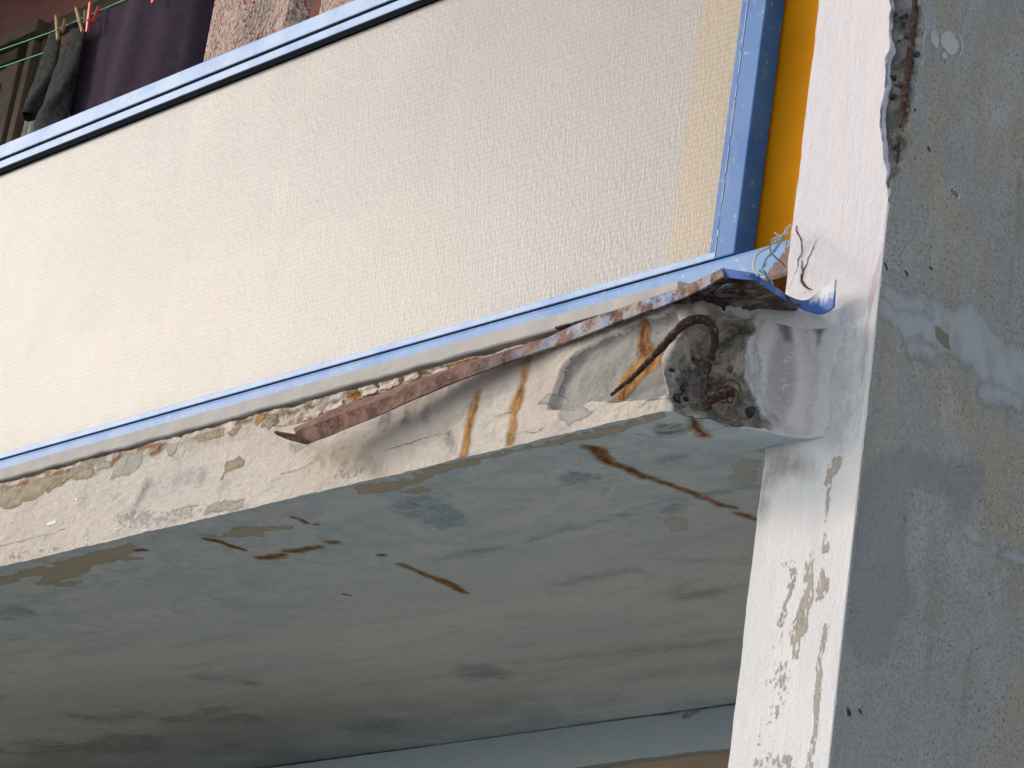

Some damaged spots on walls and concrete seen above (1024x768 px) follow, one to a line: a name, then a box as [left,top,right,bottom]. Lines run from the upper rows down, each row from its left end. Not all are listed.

crack [788,225,817,290]
spalling [261,366,450,429]
rust [459,392,480,458]
rust [507,356,531,446]
spalling [335,310,777,494]
rust [615,319,660,402]
peeling [0,442,179,509]
rust [583,445,757,521]
peeling [0,536,144,587]
rust [203,538,338,560]
peeling [766,456,842,725]
peeling [753,623,829,768]